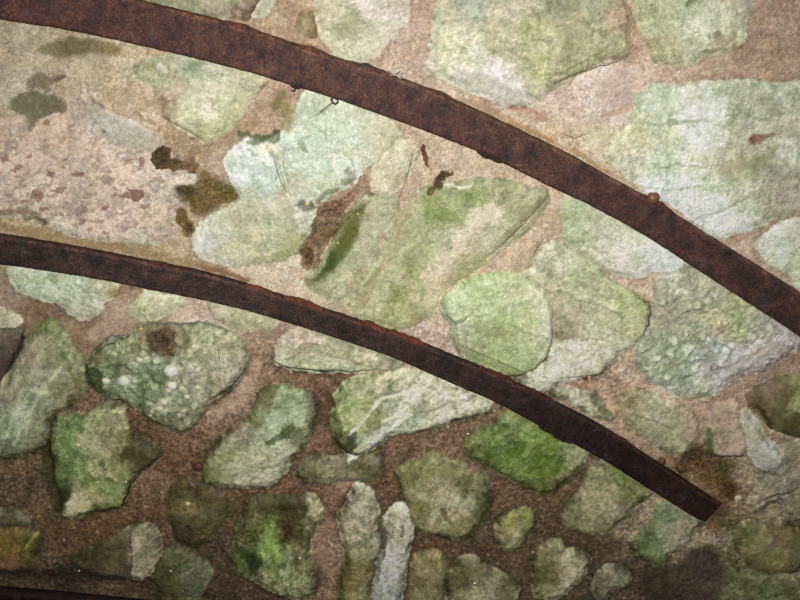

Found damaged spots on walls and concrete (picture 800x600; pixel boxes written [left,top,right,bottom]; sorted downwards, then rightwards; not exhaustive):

corrosion [221,20,261,35]
corrosion [298,45,329,57]
corrosion [345,60,391,77]
corrosion [425,87,453,101]
corrosion [750,133,775,145]
corrosion [477,149,502,163]
corrosion [639,192,677,216]
corrosion [0,222,273,295]
corrosion [283,295,323,311]
corrosion [360,320,428,348]
corrosion [477,365,557,405]
corrosion [538,424,573,444]